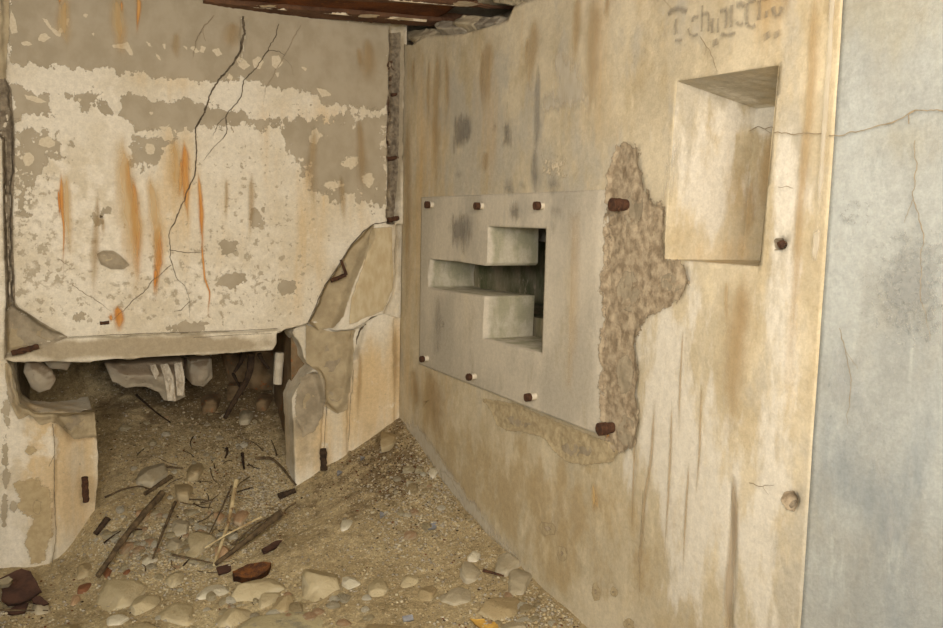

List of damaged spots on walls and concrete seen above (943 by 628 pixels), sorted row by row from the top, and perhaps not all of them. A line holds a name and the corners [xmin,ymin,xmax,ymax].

corrosion [109,307,123,327]
corrosion [126,162,140,256]
corrosion [154,230,162,287]
crack [59,15,301,338]
corrosion [179,146,210,301]
peeling [0,0,401,564]
spalling [483,142,690,465]
crack [750,109,943,333]
water stain [632,417,654,542]
water stain [666,342,683,525]
water stain [725,485,737,628]